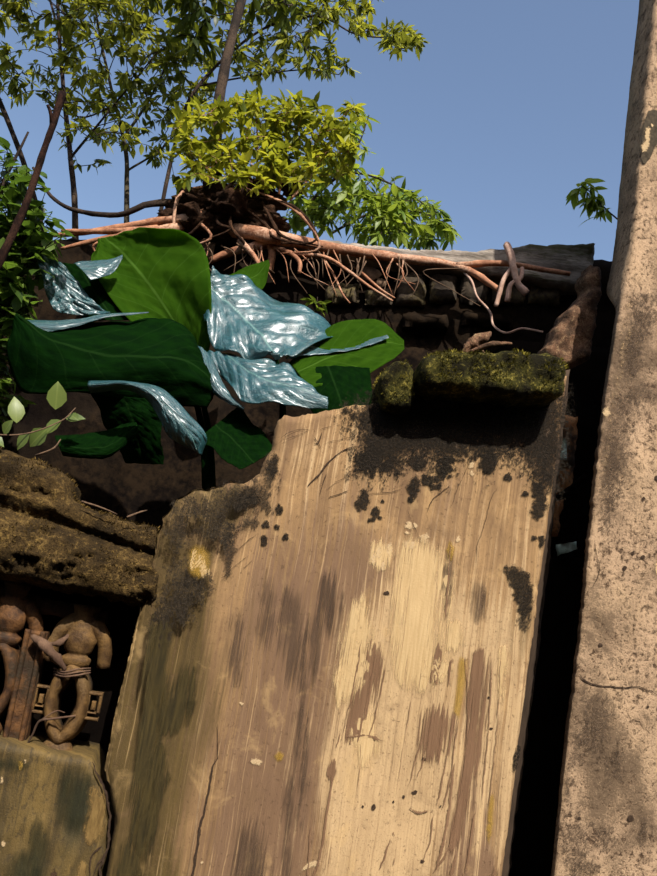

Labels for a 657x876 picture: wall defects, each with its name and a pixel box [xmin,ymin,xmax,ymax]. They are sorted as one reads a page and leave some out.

damp [328,380,574,522]
damp [596,293,657,535]
damp [503,564,534,633]
crack [579,674,657,695]
damp [557,691,626,876]